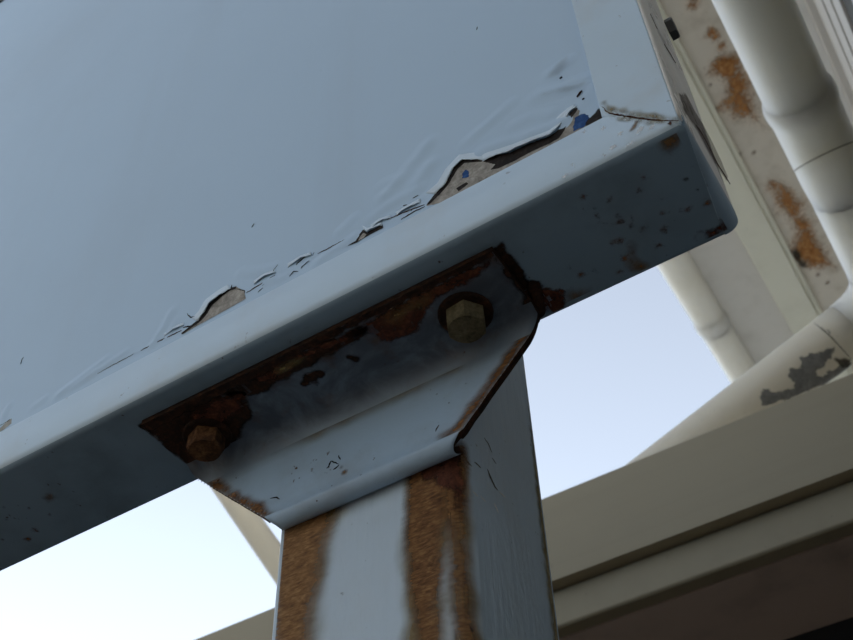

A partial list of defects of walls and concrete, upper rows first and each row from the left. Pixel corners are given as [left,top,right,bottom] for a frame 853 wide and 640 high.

rust [705,28,757,121]
peeling [348,104,589,246]
rust [706,223,728,238]
rust [769,181,836,269]
peeling [164,284,246,337]
rust [138,242,582,464]
peeling [760,347,852,406]
rust [275,506,341,640]
rust [405,445,482,640]